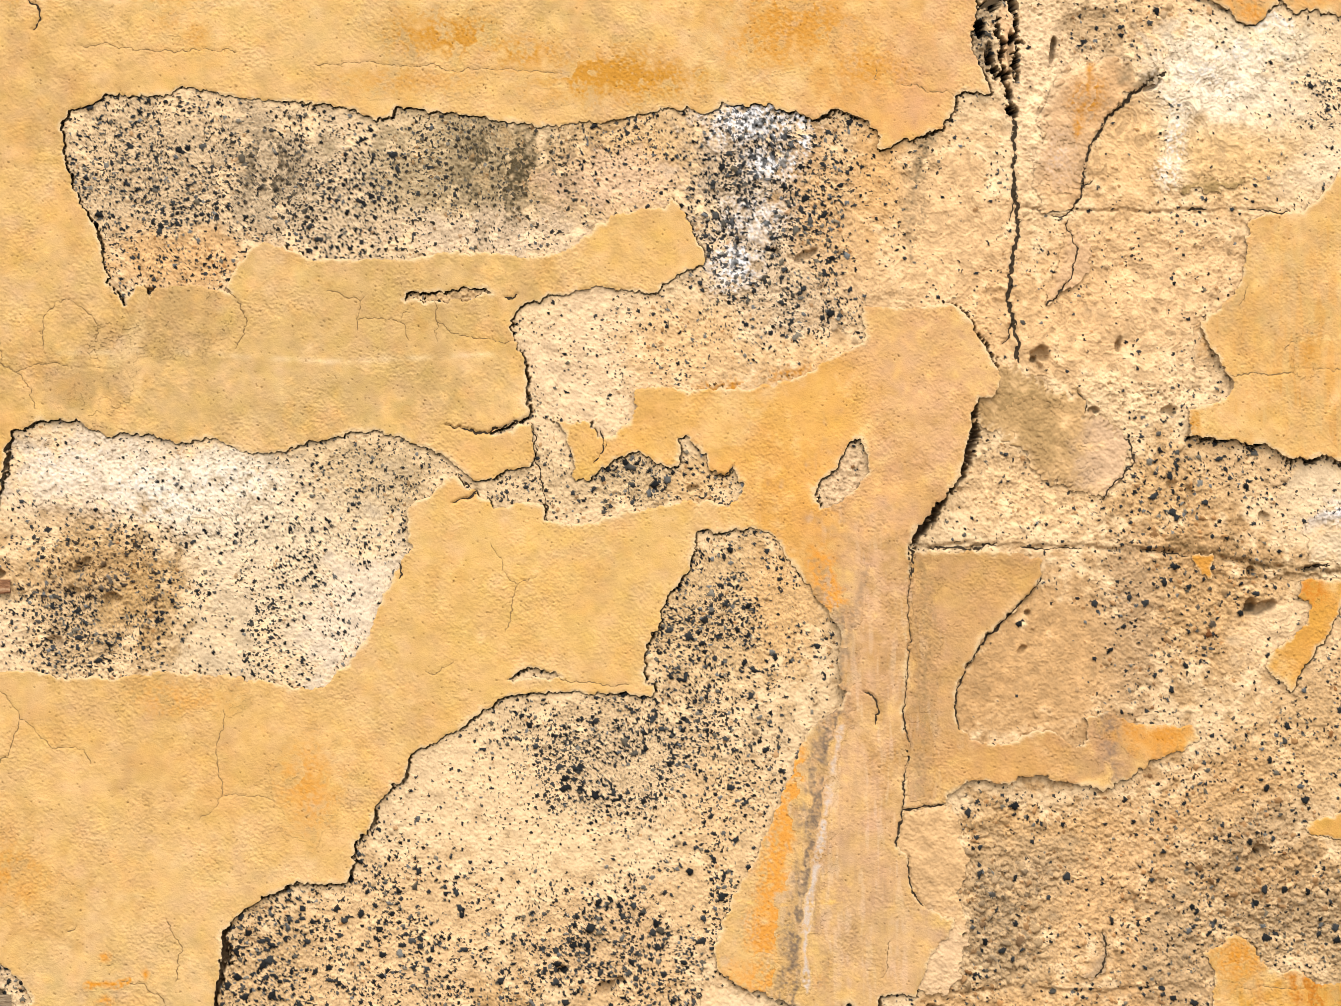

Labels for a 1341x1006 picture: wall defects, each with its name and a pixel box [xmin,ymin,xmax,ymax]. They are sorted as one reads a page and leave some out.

spalling [1197,62,1238,92]
spalling [60,86,493,306]
peeling [971,399,990,428]
spalling [135,492,162,514]
spalling [207,472,241,508]
spalling [814,438,869,508]
crack [1301,563,1330,572]
spalling [214,527,846,1006]
spalling [0,964,32,1006]